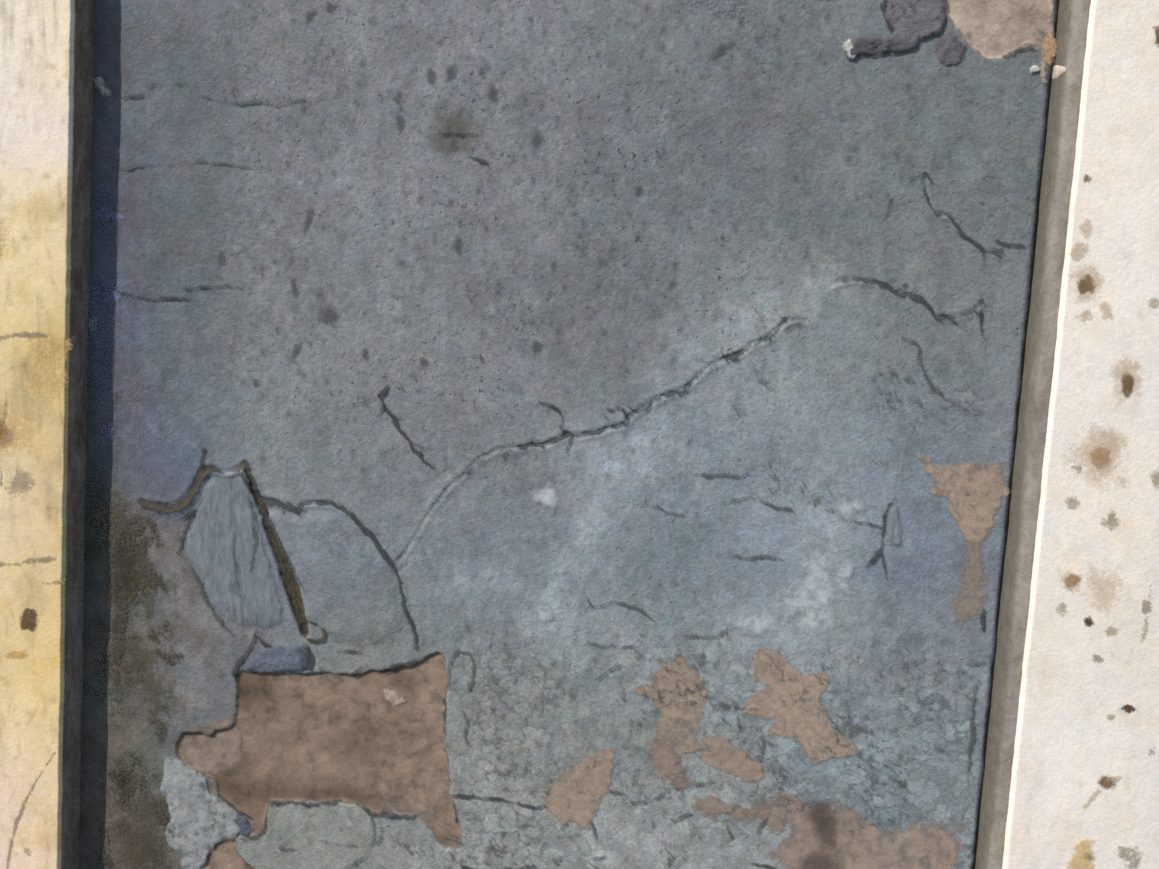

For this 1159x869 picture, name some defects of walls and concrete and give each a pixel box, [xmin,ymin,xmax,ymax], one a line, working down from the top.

spalling [945,0,1053,59]
crack [911,172,1025,260]
crack [352,317,799,514]
mould [86,475,183,743]
crack [138,448,418,677]
peeling [917,456,1009,626]
mould [99,754,172,869]
spalling [160,653,461,869]
peeling [543,749,614,828]
peeling [635,655,764,789]
peeling [743,648,858,763]
peeling [692,795,961,869]